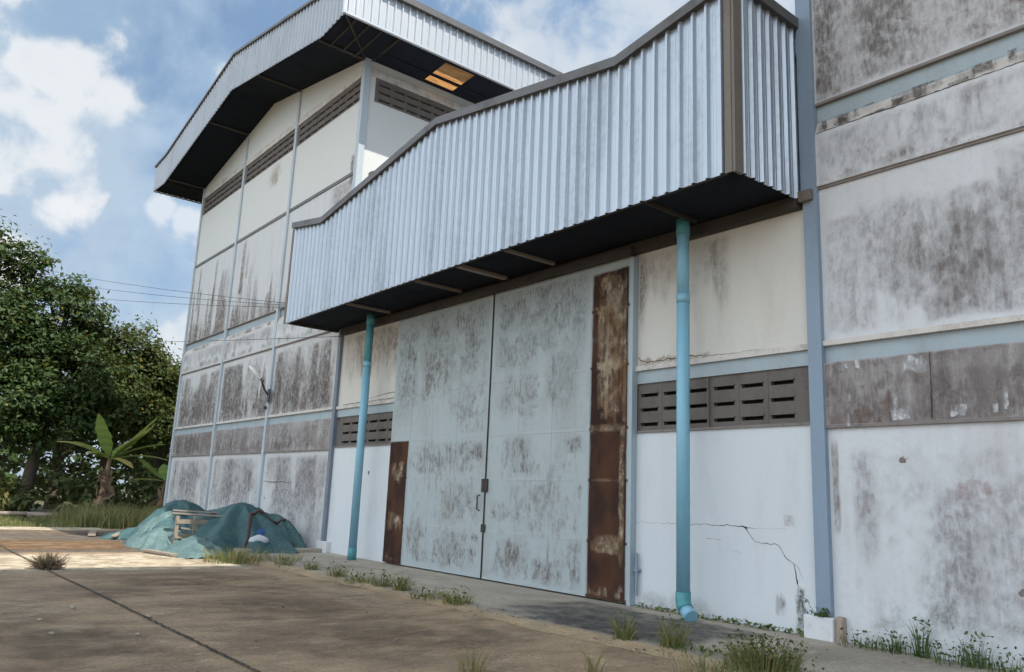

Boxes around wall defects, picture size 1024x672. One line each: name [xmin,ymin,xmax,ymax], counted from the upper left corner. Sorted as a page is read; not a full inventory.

spalling [815,48,1024,135]
damp [188,282,273,350]
damp [176,341,331,455]
rust [587,267,629,603]
peeling [892,397,910,420]
peeling [897,355,922,371]
peeling [993,391,1009,412]
rust [382,441,409,564]
crack [637,522,810,623]